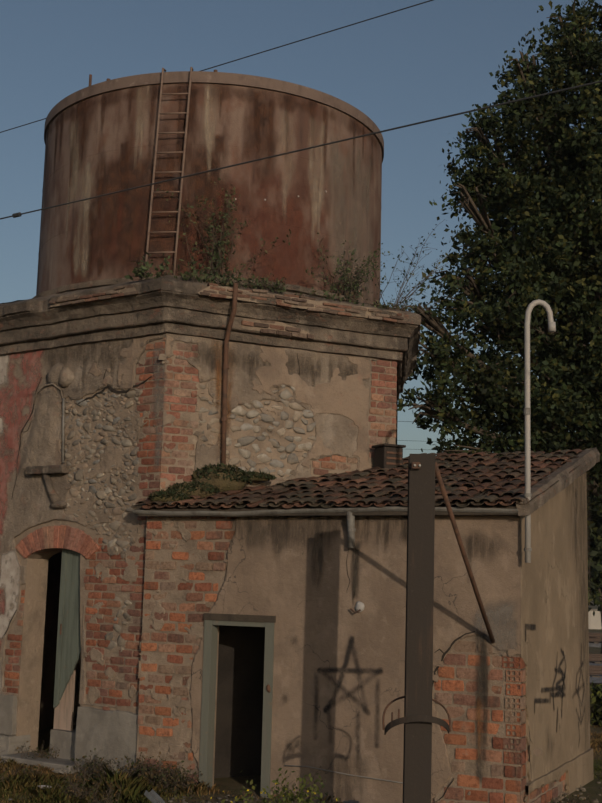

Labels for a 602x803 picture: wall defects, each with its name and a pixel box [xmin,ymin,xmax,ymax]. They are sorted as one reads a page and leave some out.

rust [84,89,195,275]
rust [247,91,314,169]
crack [78,371,152,404]
flaking render [55,335,397,789]
flaking render [431,635,568,803]